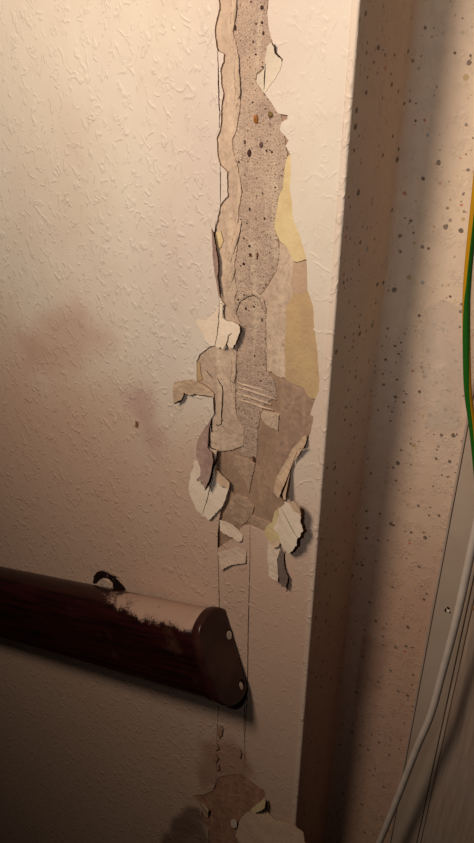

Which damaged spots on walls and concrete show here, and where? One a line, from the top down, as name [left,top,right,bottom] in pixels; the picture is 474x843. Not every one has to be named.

spalling [197,0,320,530]
spalling [193,726,266,843]